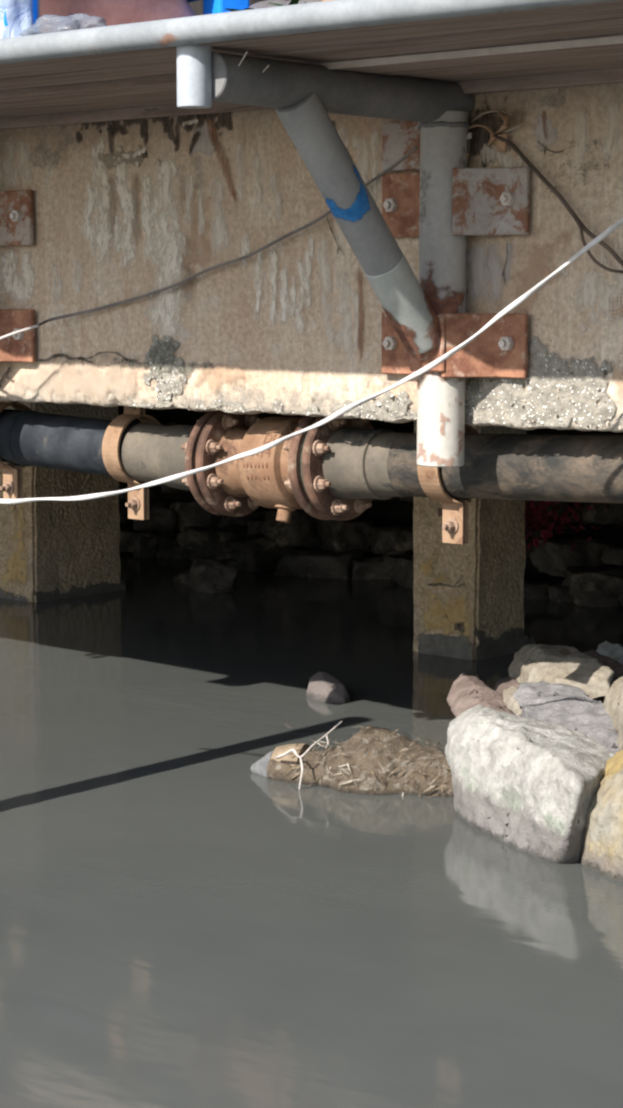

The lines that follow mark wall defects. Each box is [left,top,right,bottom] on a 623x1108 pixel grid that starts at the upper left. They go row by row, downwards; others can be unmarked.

damp [83,138,229,338]
crack [0,367,15,393]
crack [38,351,136,362]
spalling [109,330,417,422]
damp [241,234,359,357]
rust [382,263,465,358]
spalling [465,336,623,431]